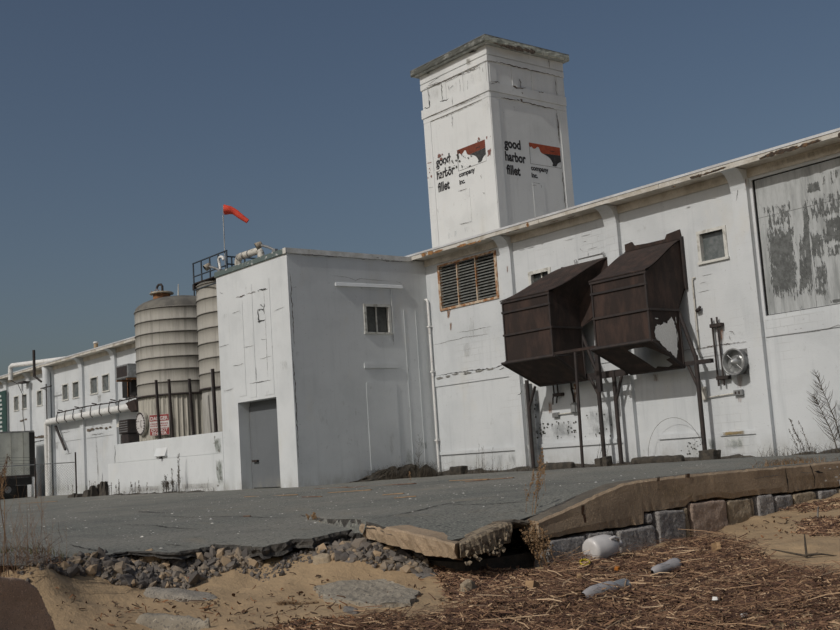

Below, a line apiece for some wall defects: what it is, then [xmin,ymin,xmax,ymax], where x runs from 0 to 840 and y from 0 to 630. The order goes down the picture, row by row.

spalling [759,139,821,159]
peeling [762,170,840,303]
peeling [655,317,678,357]